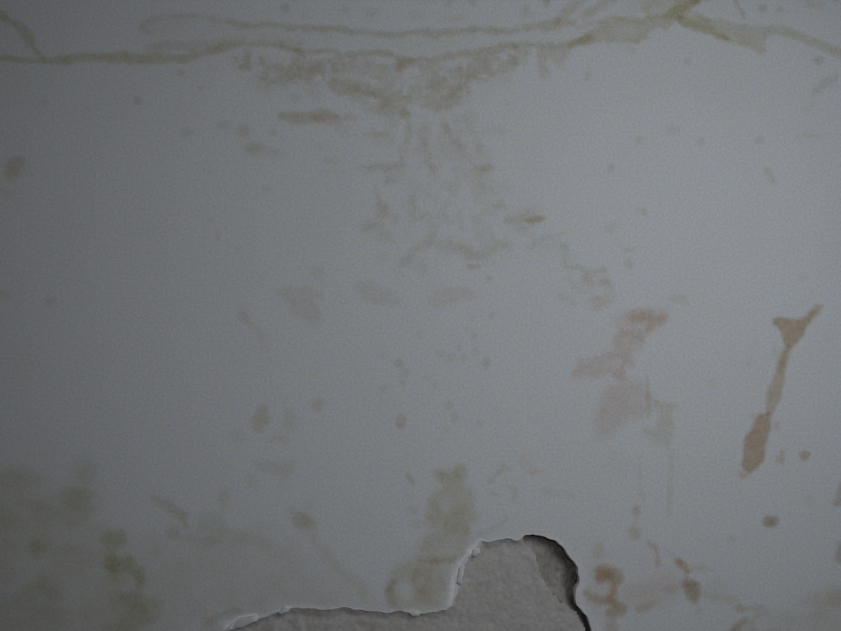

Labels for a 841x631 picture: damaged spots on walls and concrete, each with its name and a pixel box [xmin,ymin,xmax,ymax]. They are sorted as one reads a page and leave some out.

flaking render [224,533,593,631]